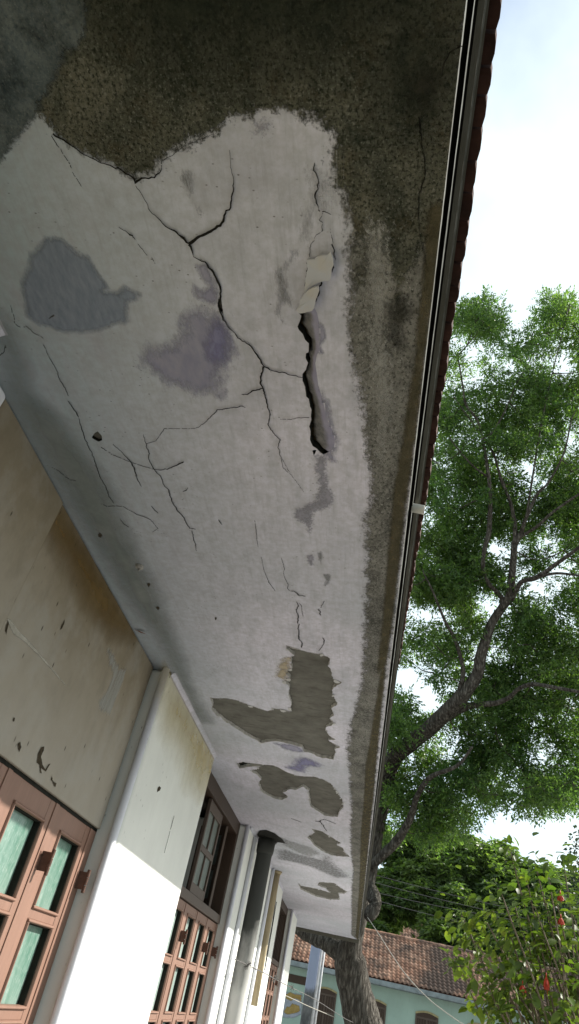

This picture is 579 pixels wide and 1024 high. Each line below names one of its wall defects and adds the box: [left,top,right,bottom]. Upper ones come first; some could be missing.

crack [306,163,336,301]
crack [0,133,309,546]
leakage [0,0,466,940]
spalling [210,646,342,760]
spalling [250,765,344,817]
spalling [298,882,347,900]
spalling [307,829,350,857]